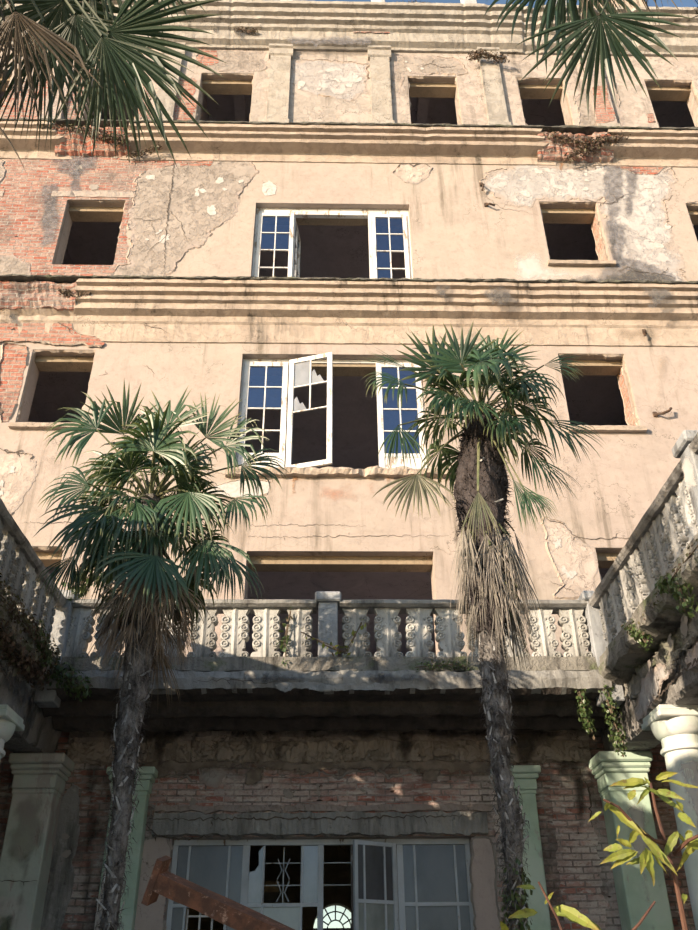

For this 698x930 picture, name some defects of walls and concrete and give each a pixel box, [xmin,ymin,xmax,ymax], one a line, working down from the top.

peeling [290,59,370,102]
flaking render [574,77,624,127]
flaking render [0,156,259,276]
peeling [479,163,688,282]
water stain [519,166,675,307]
flaking render [0,322,104,422]
flaking render [0,449,37,515]
flaking render [540,516,598,600]
spalling [623,606,698,724]